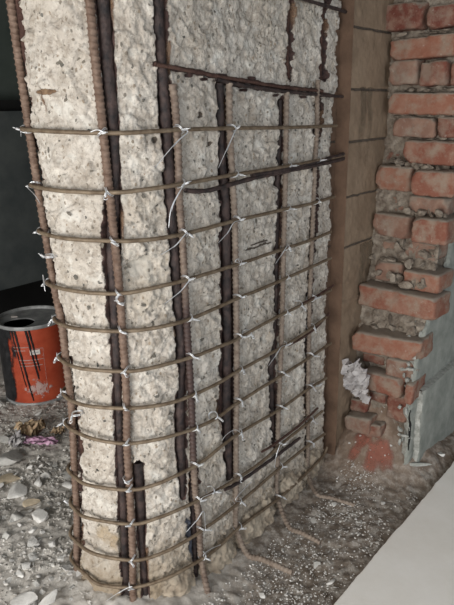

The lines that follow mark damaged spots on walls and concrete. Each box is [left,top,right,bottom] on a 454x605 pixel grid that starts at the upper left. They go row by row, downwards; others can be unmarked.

spalling [5,0,111,571]
spalling [77,0,157,602]
rust [97,0,149,596]
spalling [168,75,211,597]
rust [153,0,347,577]
spalling [225,83,296,576]
spalling [273,173,322,545]
spalling [299,80,356,507]
spalling [397,404,432,466]